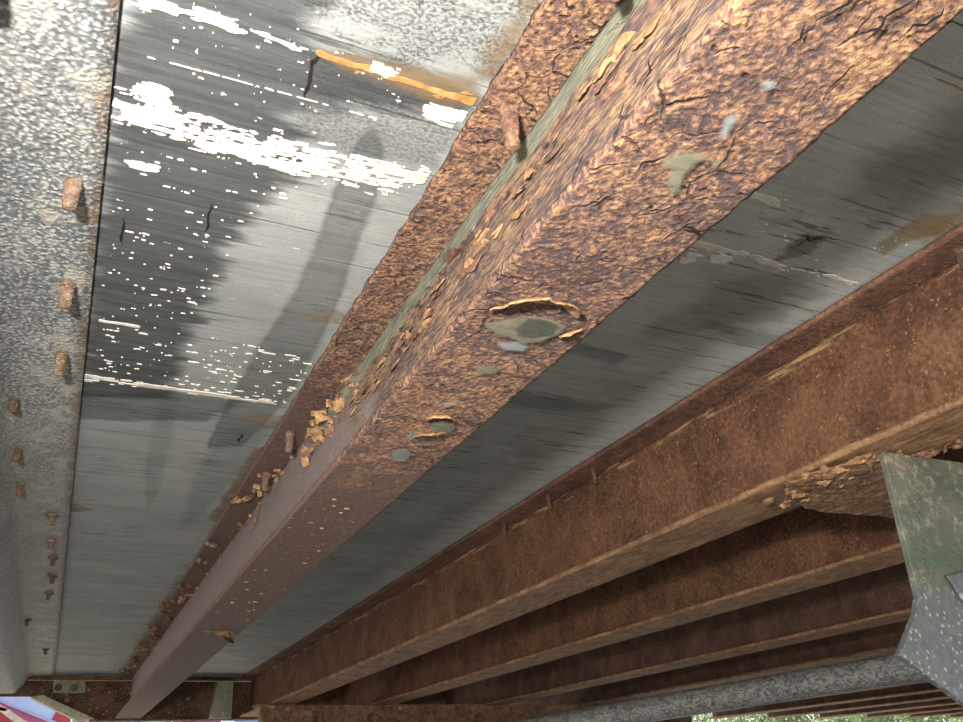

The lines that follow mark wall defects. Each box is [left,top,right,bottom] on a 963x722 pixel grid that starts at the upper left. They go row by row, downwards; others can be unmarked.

peeling [128,0,314,73]
peeling [169,62,329,112]
rust [308,50,477,106]
peeling [422,102,468,128]
rust [576,0,677,103]
crack [787,0,853,49]
crack [824,66,852,93]
crack [862,0,963,42]
peeling [98,269,218,342]
rust [348,138,568,417]
rust [490,297,582,338]
peeling [84,333,312,405]